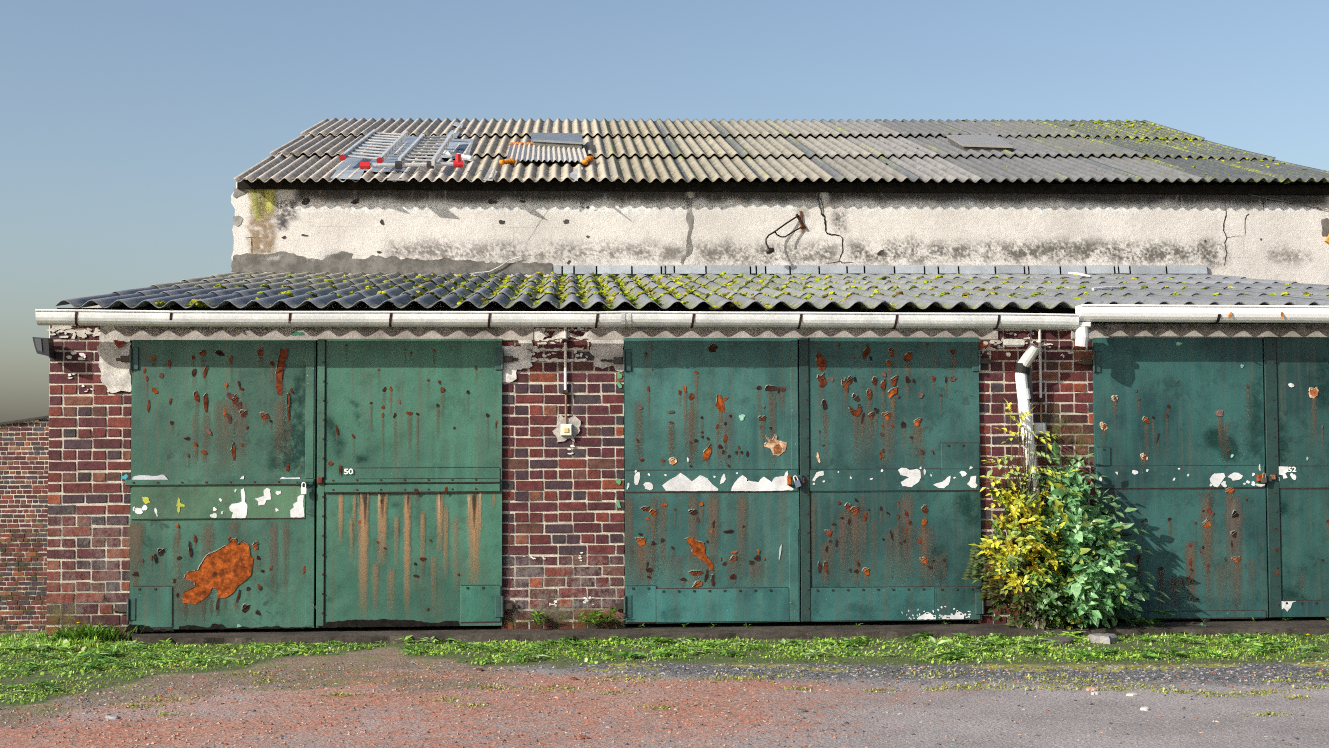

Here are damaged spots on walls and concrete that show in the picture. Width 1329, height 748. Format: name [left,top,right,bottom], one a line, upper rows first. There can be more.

leakage [249,189,684,259]
crack [680,196,694,264]
leakage [700,245,834,262]
leakage [851,242,1224,263]
crack [1223,202,1264,263]
flaking render [47,325,132,393]
rust [816,343,957,459]
peeling [210,476,304,518]
peeling [627,458,793,491]
peeling [870,466,977,488]
rust [125,523,459,633]
rust [635,501,765,587]